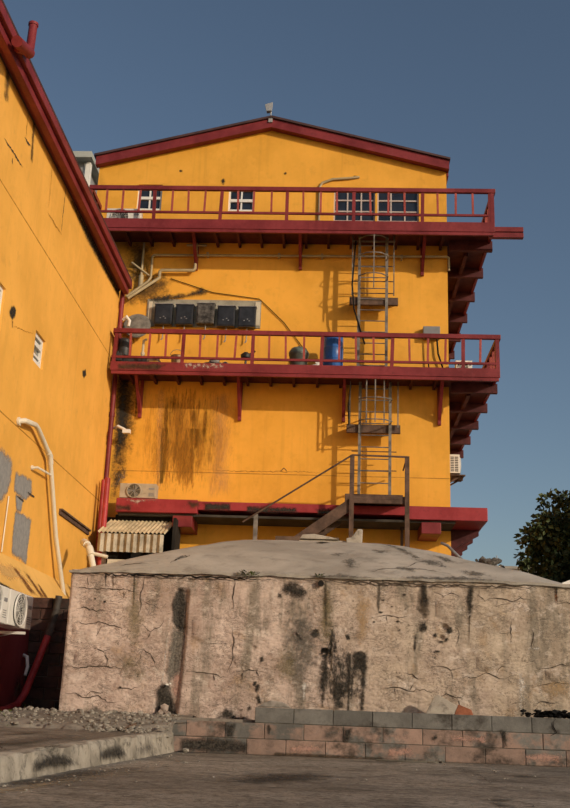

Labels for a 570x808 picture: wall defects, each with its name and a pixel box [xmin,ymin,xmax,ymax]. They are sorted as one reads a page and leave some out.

water stain [131,245,148,279]
water stain [114,379,137,482]
peeling [0,451,35,564]
water stain [156,588,186,714]
crack [67,555,570,705]
water stain [319,553,367,711]
water stain [397,566,485,652]
crack [533,664,570,736]